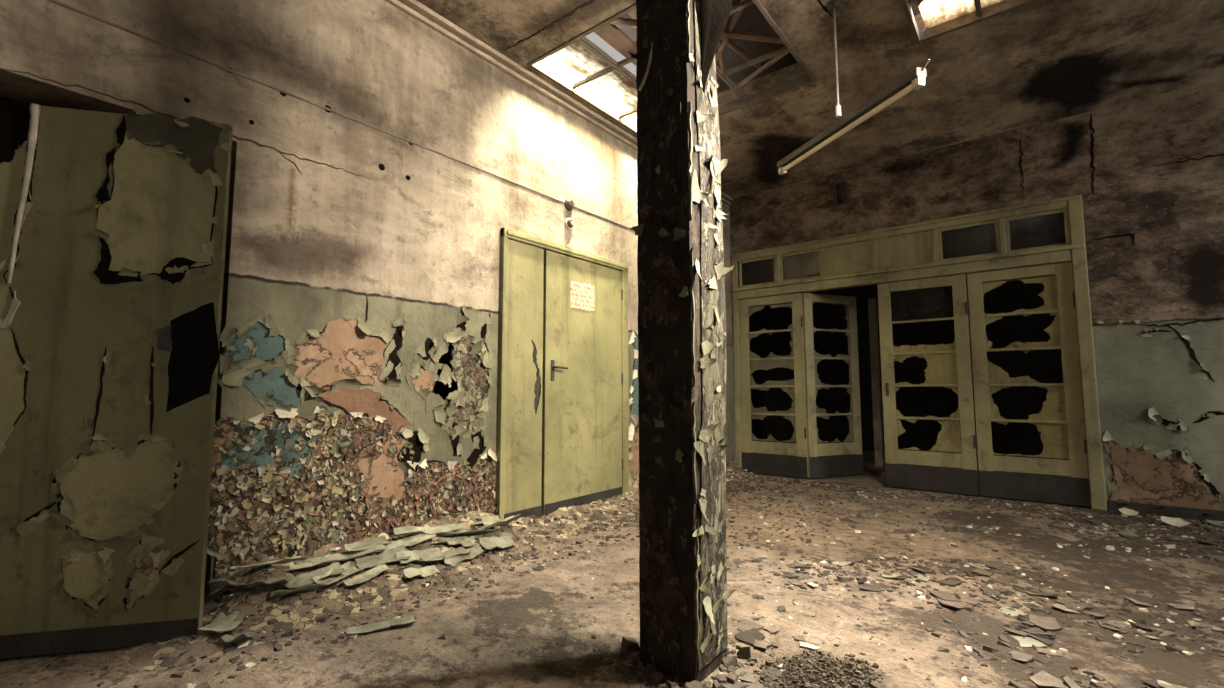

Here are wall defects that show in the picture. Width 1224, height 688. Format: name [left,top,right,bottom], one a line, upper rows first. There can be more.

leakage [1115,77,1182,88]
leakage [1053,123,1087,168]
crack [1155,153,1224,166]
peeling [90,97,230,284]
peeling [0,99,42,453]
peeling [1096,318,1224,329]
crack [1137,325,1215,382]
peeling [207,305,498,579]
flaking render [1103,407,1224,517]
crack [1186,453,1224,505]
crack [1193,410,1224,423]